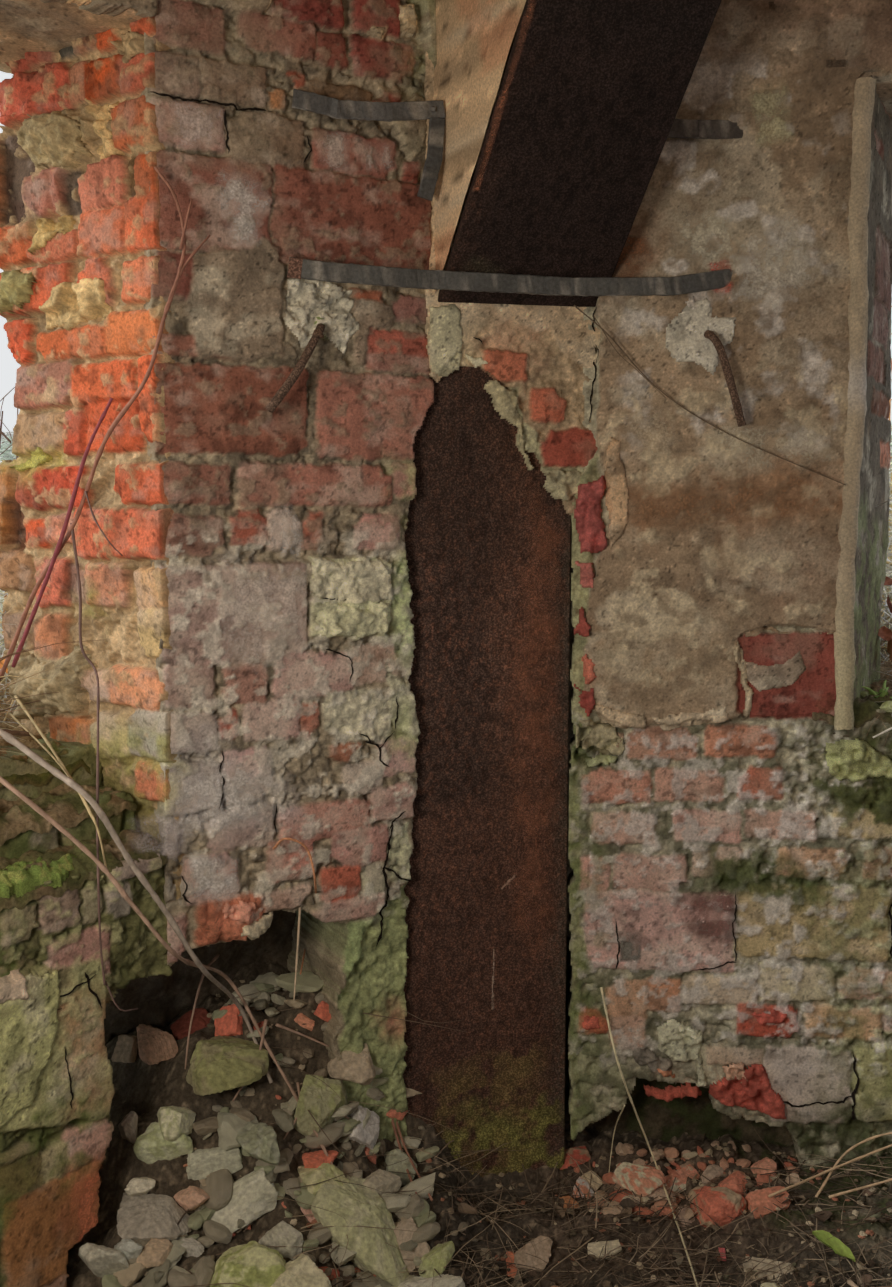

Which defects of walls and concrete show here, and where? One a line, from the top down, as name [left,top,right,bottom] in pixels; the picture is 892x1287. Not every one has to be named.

spalling [265,0,417,39]
spalling [0,63,71,117]
crack [151,91,272,151]
spalling [428,304,630,588]
spalling [308,555,392,638]
spalling [574,607,591,637]
crack [326,649,354,680]
spalling [574,625,836,767]
crack [359,697,399,767]
crack [218,750,226,808]
spalling [644,1062,786,1119]